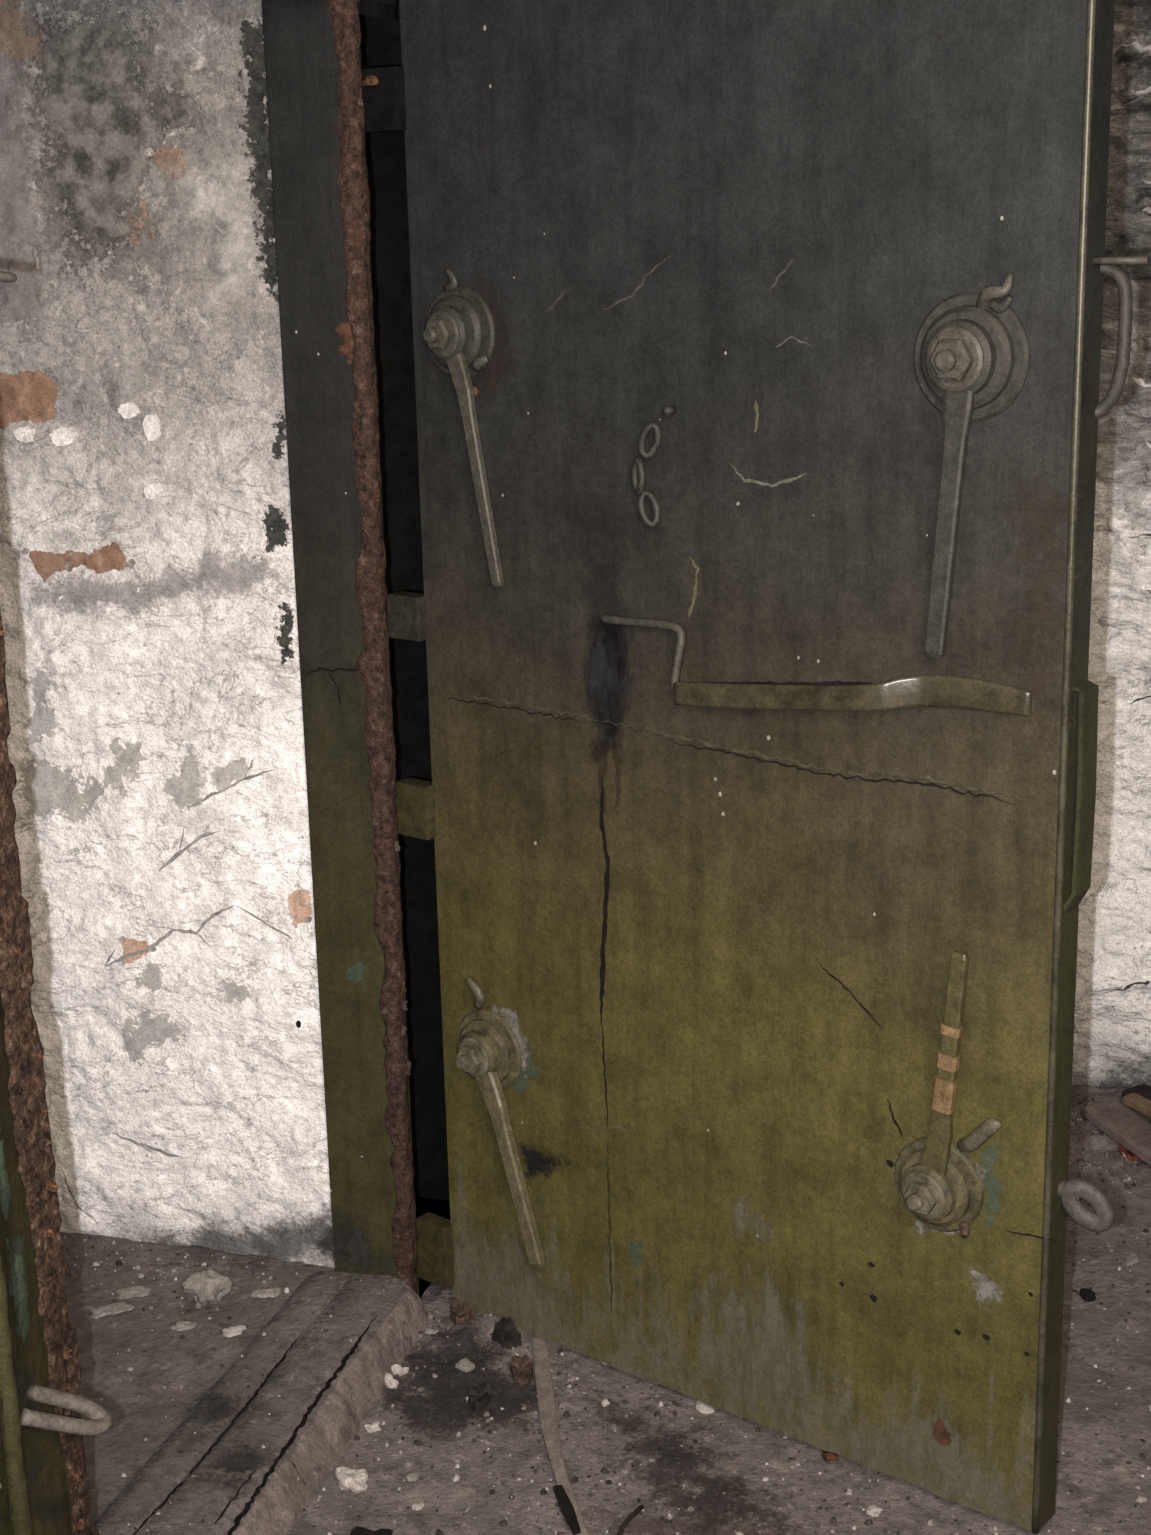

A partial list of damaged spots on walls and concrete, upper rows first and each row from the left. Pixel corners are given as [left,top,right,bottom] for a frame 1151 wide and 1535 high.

corrosion [336,321,354,363]
flaking render [0,368,78,447]
flaking render [22,542,136,582]
crack [448,693,1035,805]
crack [600,777,613,1315]